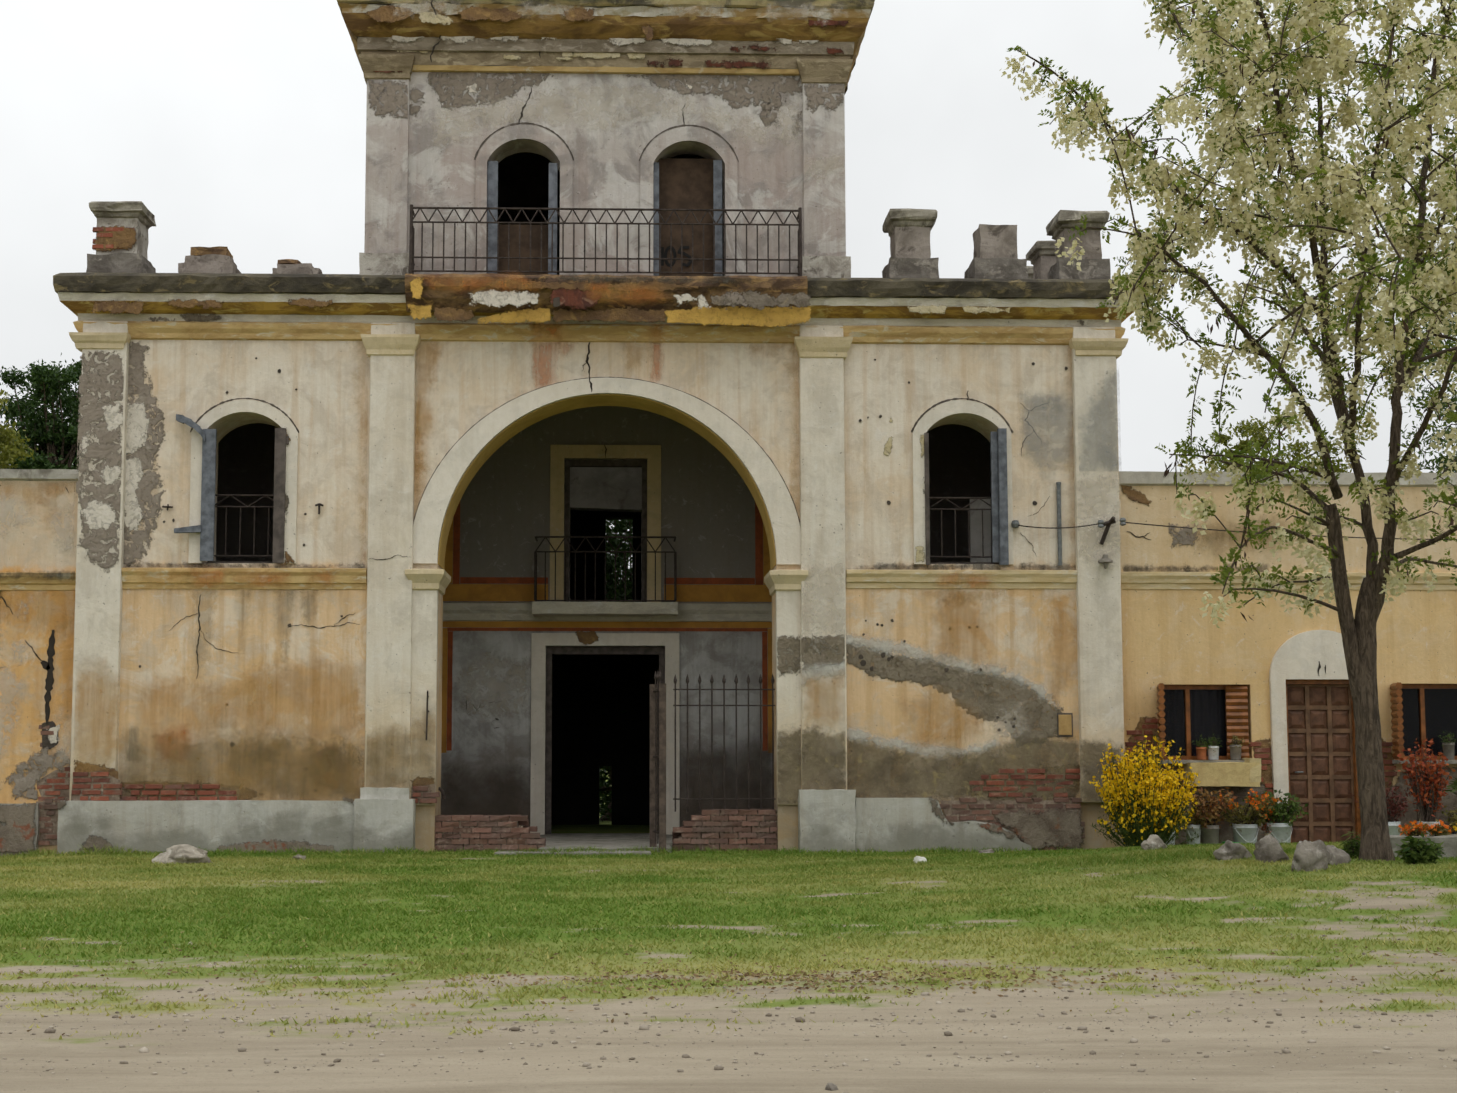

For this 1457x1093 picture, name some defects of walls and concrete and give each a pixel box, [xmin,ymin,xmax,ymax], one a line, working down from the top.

flaking render [365,4,849,135]
flaking render [408,279,812,328]
crack [582,321,592,392]
flaking render [76,342,175,573]
crack [169,595,237,679]
flaking render [777,619,1063,746]
spalling [0,724,262,853]
spalling [217,839,334,853]
spalling [929,765,1085,850]
spalling [1381,738,1457,835]